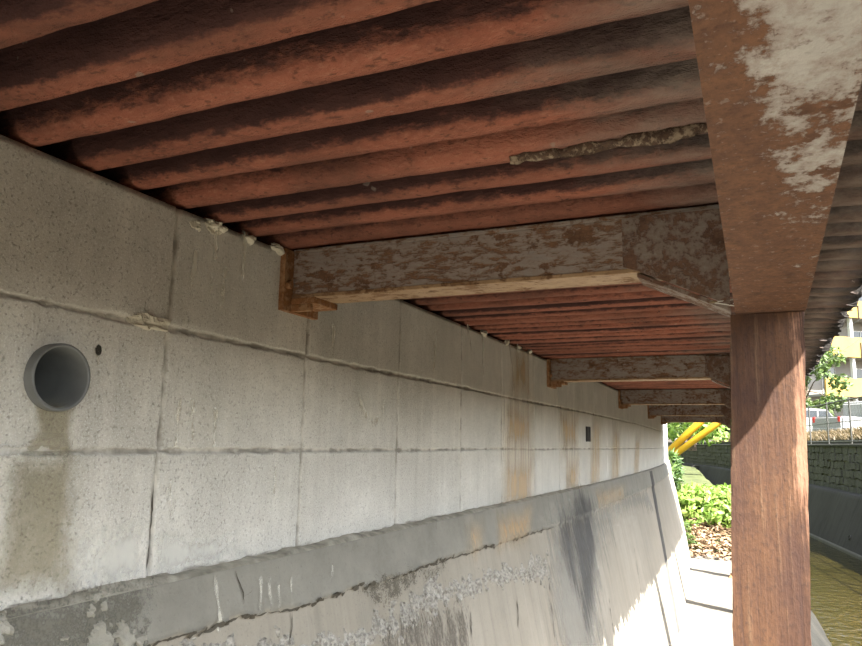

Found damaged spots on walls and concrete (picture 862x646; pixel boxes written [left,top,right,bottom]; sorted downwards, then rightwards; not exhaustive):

peeling [509,123,708,165]
damp [550,485,652,646]
peeling [0,610,15,645]
peeling [80,591,147,646]
spalling [171,550,553,646]